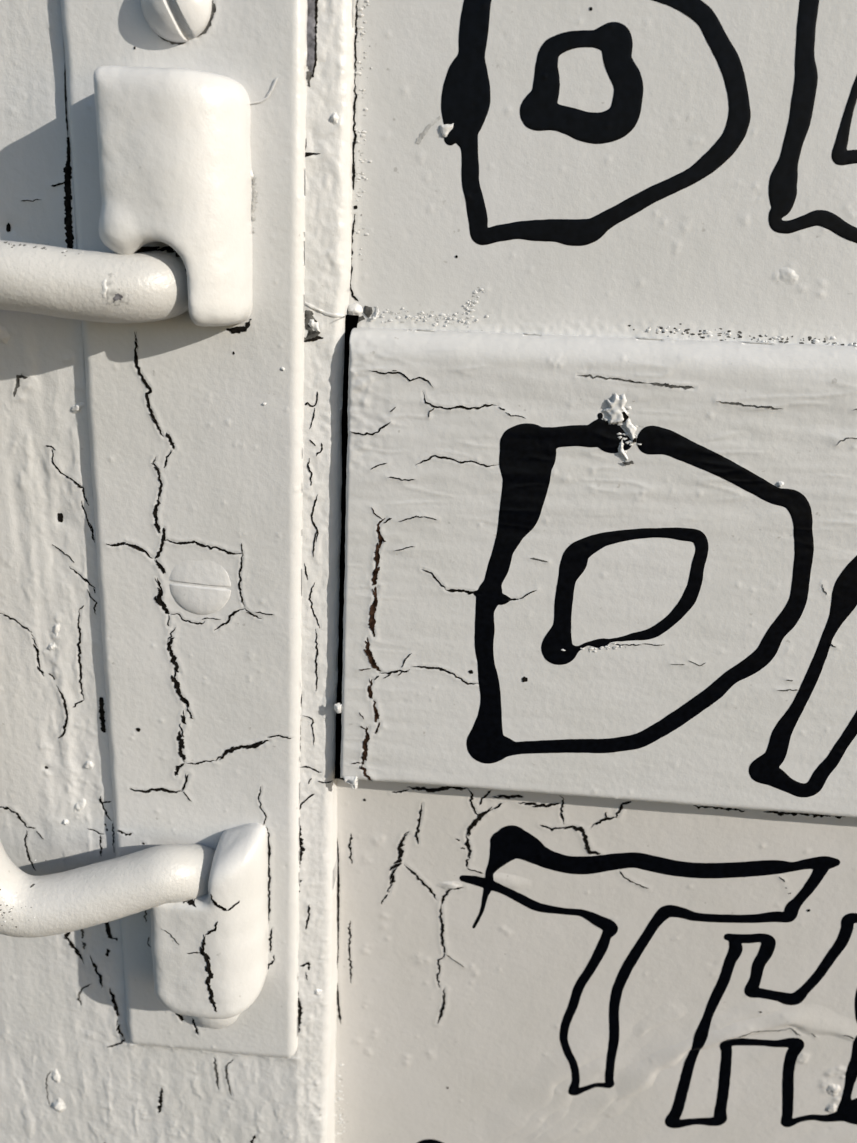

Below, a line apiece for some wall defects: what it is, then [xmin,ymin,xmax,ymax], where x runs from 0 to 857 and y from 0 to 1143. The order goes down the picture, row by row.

peeling [602,393,644,465]
crack [577,374,694,390]
crack [717,401,782,409]
crack [1,544,97,738]
crack [616,643,705,666]
crack [46,332,631,1048]
crack [0,806,43,871]